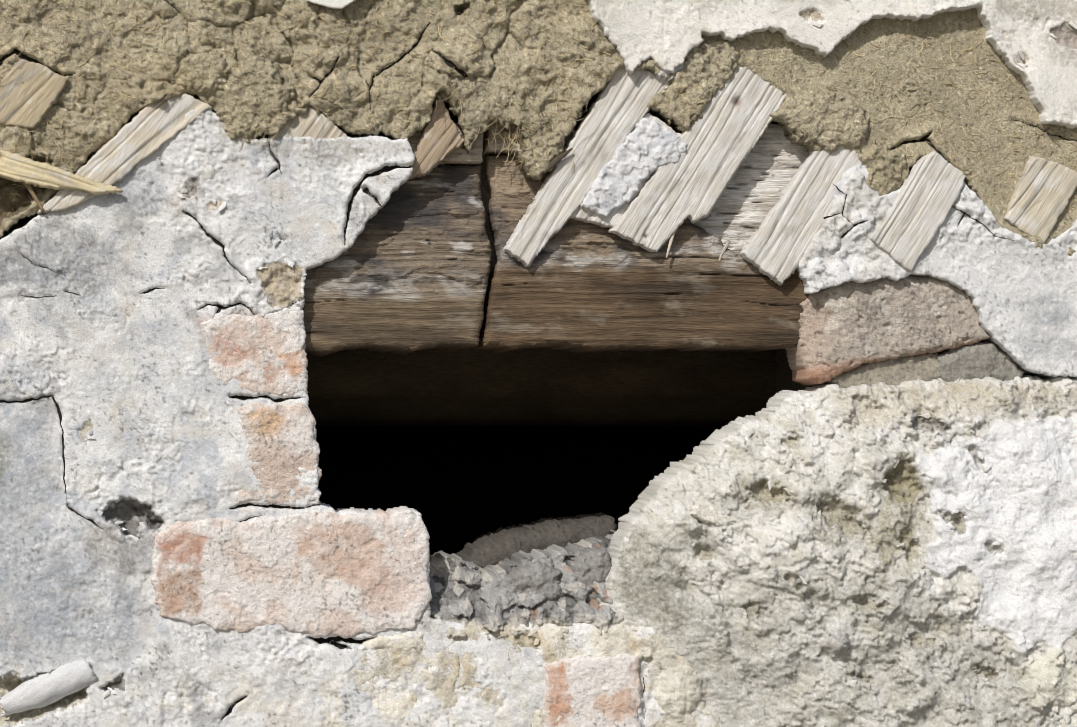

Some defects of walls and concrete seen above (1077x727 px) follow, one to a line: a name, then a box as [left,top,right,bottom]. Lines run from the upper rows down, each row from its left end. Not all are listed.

peeling [306,0,356,9]
crack [0,49,76,76]
crack [369,22,468,109]
peeling [588,0,1077,129]
crack [891,132,950,163]
spalling [177,174,201,198]
crack [344,165,413,245]
crack [183,211,254,315]
crack [0,395,104,530]
spalling [744,479,798,505]
spalling [97,498,163,544]
spalling [692,541,719,561]